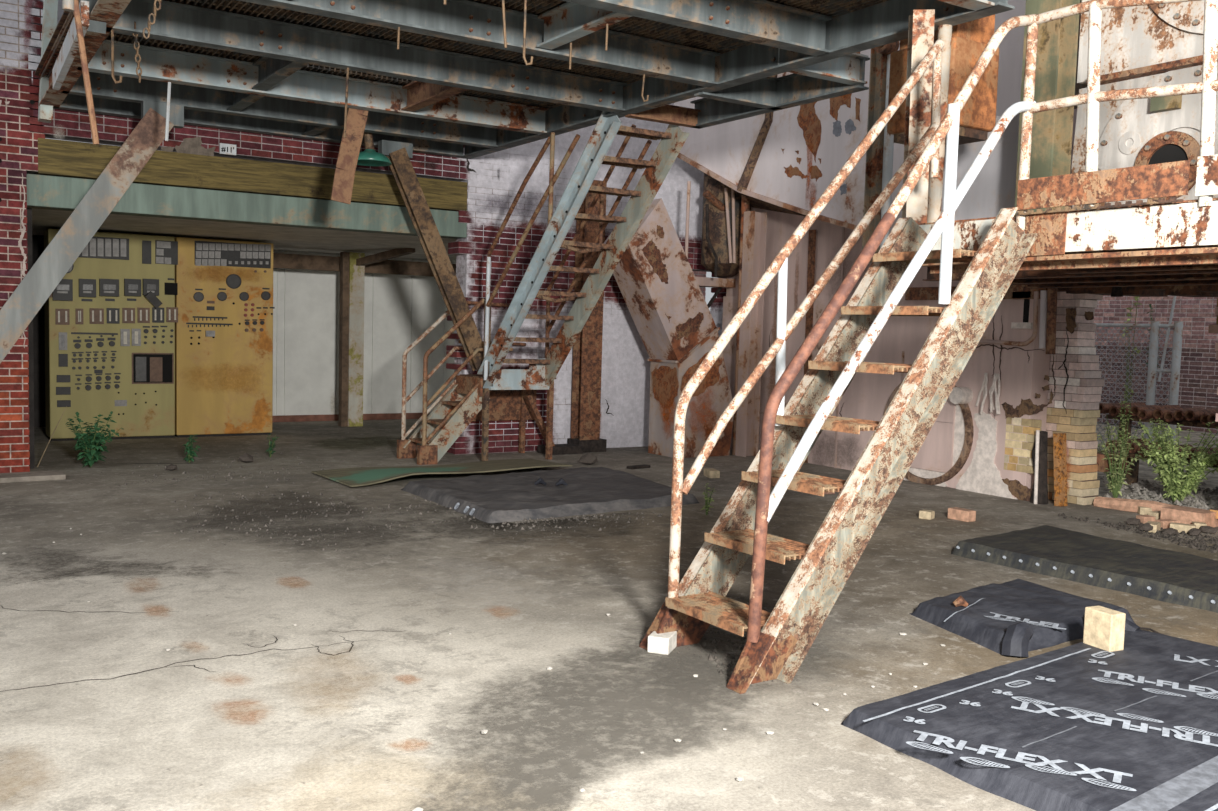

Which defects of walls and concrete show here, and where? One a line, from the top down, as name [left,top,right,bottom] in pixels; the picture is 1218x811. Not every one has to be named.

crack [0,630,396,692]
leakage [430,624,762,811]